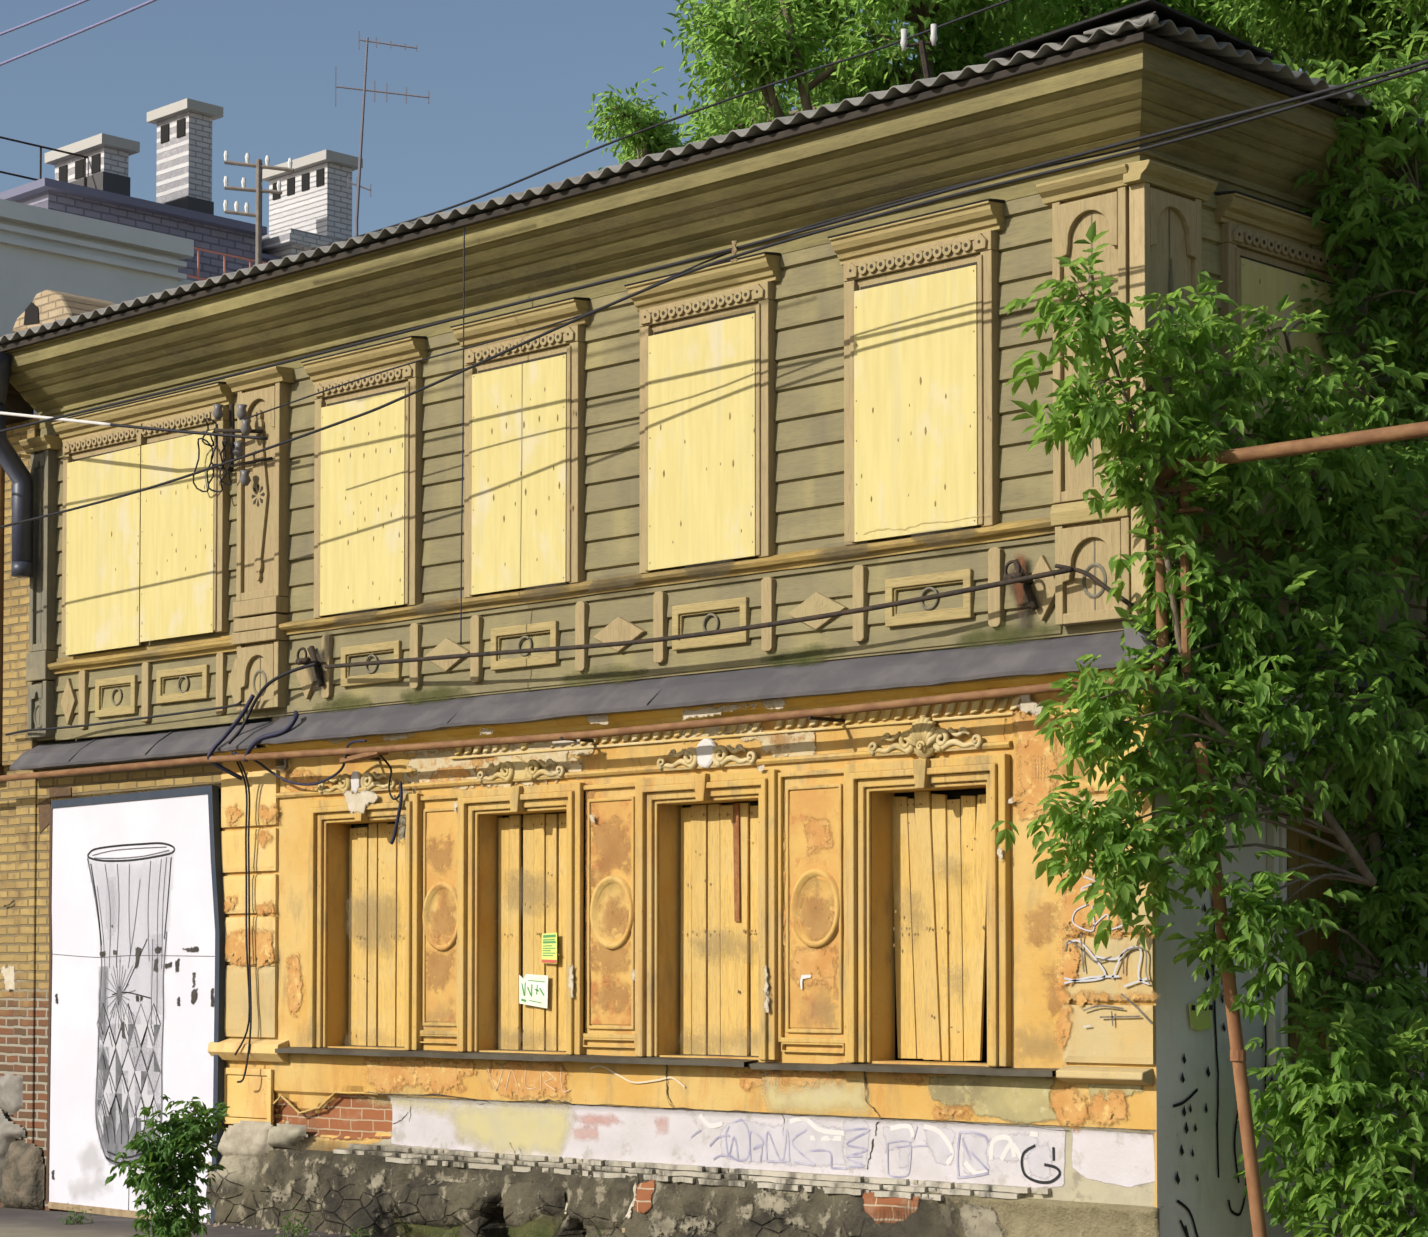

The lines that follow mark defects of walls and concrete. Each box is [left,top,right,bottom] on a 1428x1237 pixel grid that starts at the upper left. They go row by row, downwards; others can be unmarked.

peeling [585,714,608,725]
peeling [679,698,817,771]
peeling [1008,695,1127,820]
peeling [382,728,631,998]
peeling [223,896,236,912]
peeling [224,901,303,1017]
peeling [763,897,839,1013]
flaking render [273,1058,568,1140]
peeling [1050,1085,1128,1130]
peeling [270,1154,355,1202]
peeling [370,1169,387,1193]
flaking render [835,1192,919,1237]